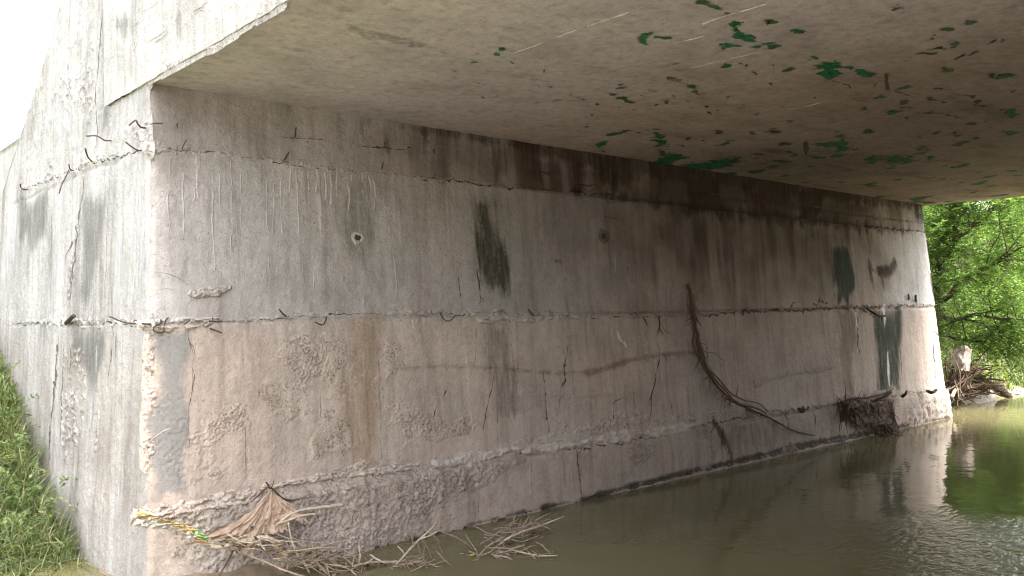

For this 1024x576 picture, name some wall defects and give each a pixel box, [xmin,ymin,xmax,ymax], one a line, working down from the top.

crack [11,3,167,460]
spalling [48,250,337,474]
crack [164,269,484,452]
damp [476,204,509,287]
crack [474,347,533,494]
crack [414,176,931,359]
crack [528,344,836,498]
damp [513,142,923,234]
damp [834,248,858,361]
damp [869,259,896,278]
damp [874,295,904,390]
peeling [130,490,260,521]